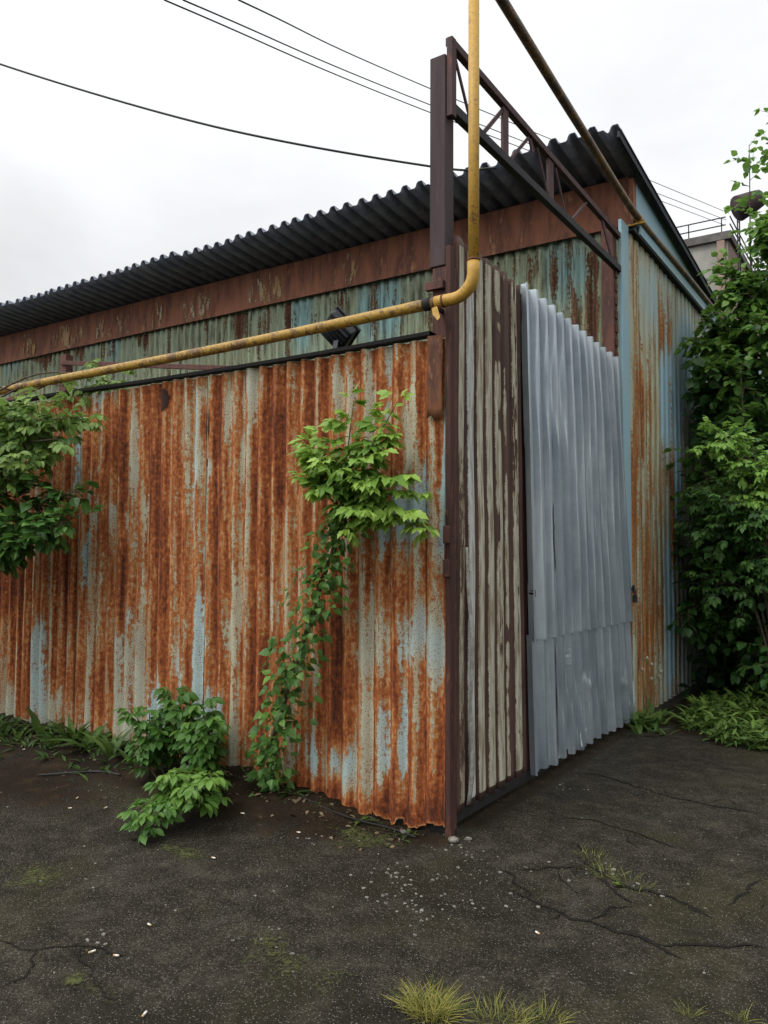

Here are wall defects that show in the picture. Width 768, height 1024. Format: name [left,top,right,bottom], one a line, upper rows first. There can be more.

corrosion [0,272,446,828]
peeling [459,245,523,804]
corrosion [497,240,602,342]
corrosion [630,239,703,712]
crack [0,940,124,999]
crack [500,817,766,959]